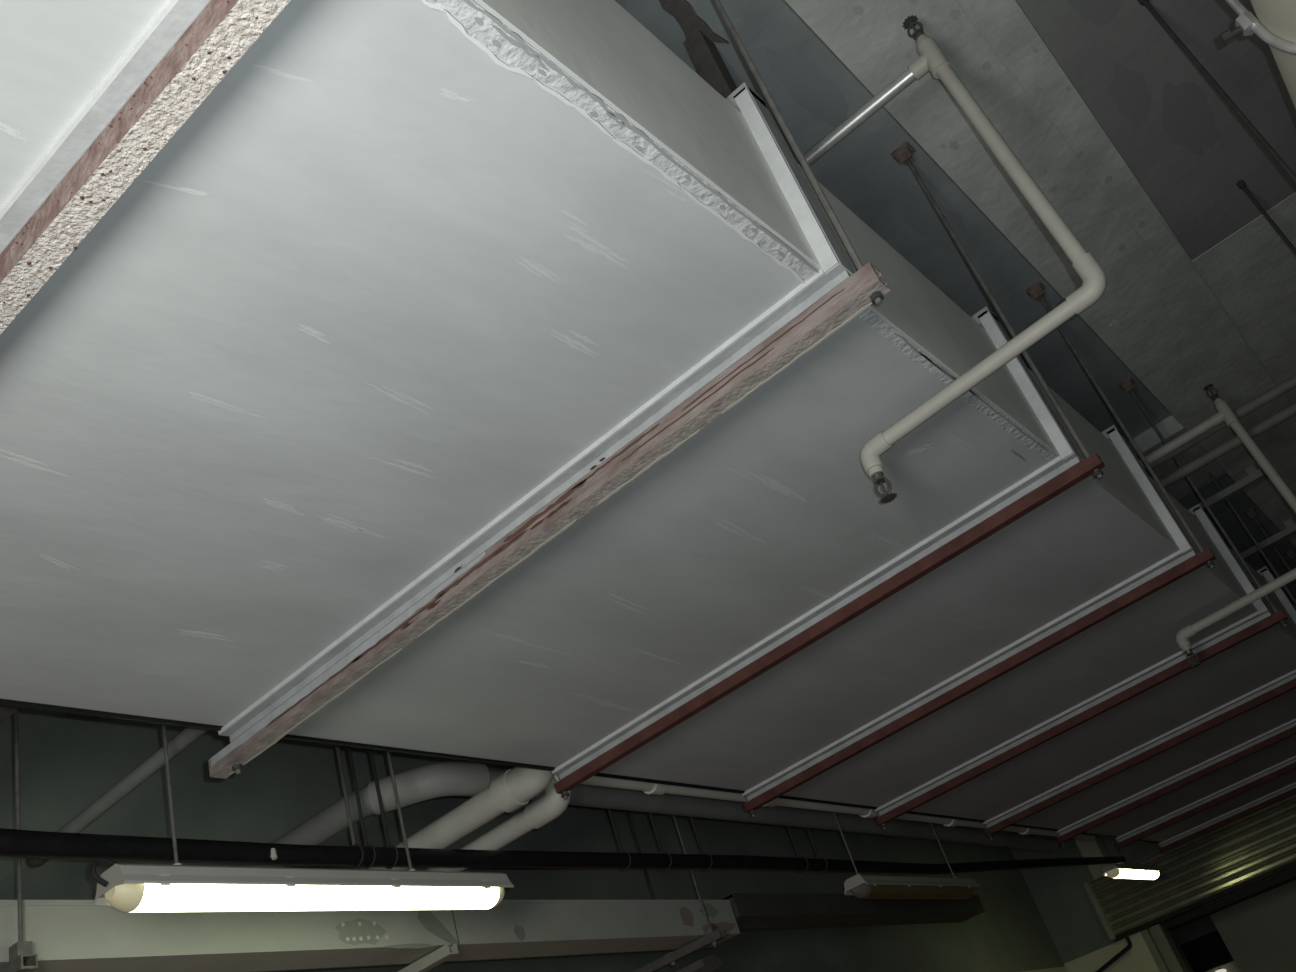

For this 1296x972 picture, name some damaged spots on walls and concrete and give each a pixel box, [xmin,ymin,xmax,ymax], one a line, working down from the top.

peeling [422,0,806,284]
corrosion [266,289,844,727]